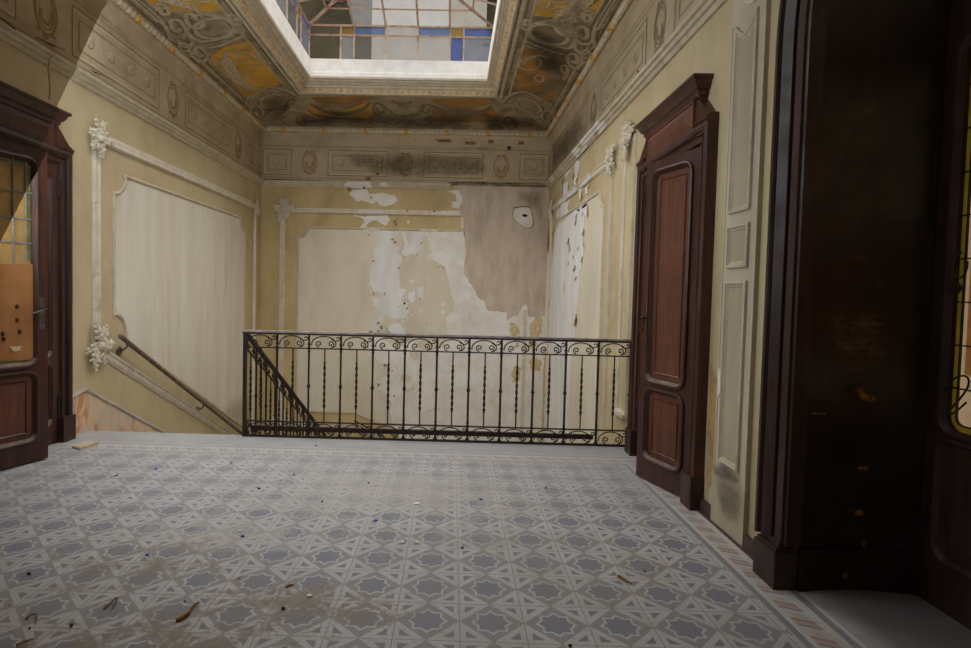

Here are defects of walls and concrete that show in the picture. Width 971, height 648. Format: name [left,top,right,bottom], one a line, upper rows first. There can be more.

peeling [344,120,606,443]